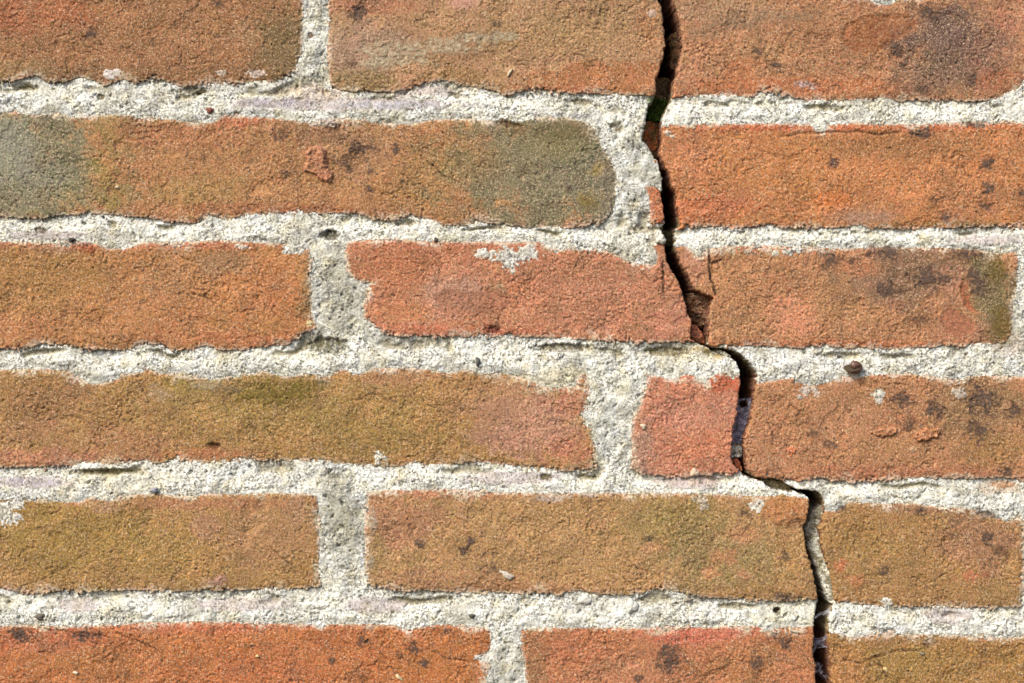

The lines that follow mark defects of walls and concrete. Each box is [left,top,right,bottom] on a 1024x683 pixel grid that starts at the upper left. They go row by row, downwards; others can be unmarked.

crack [633,0,912,683]